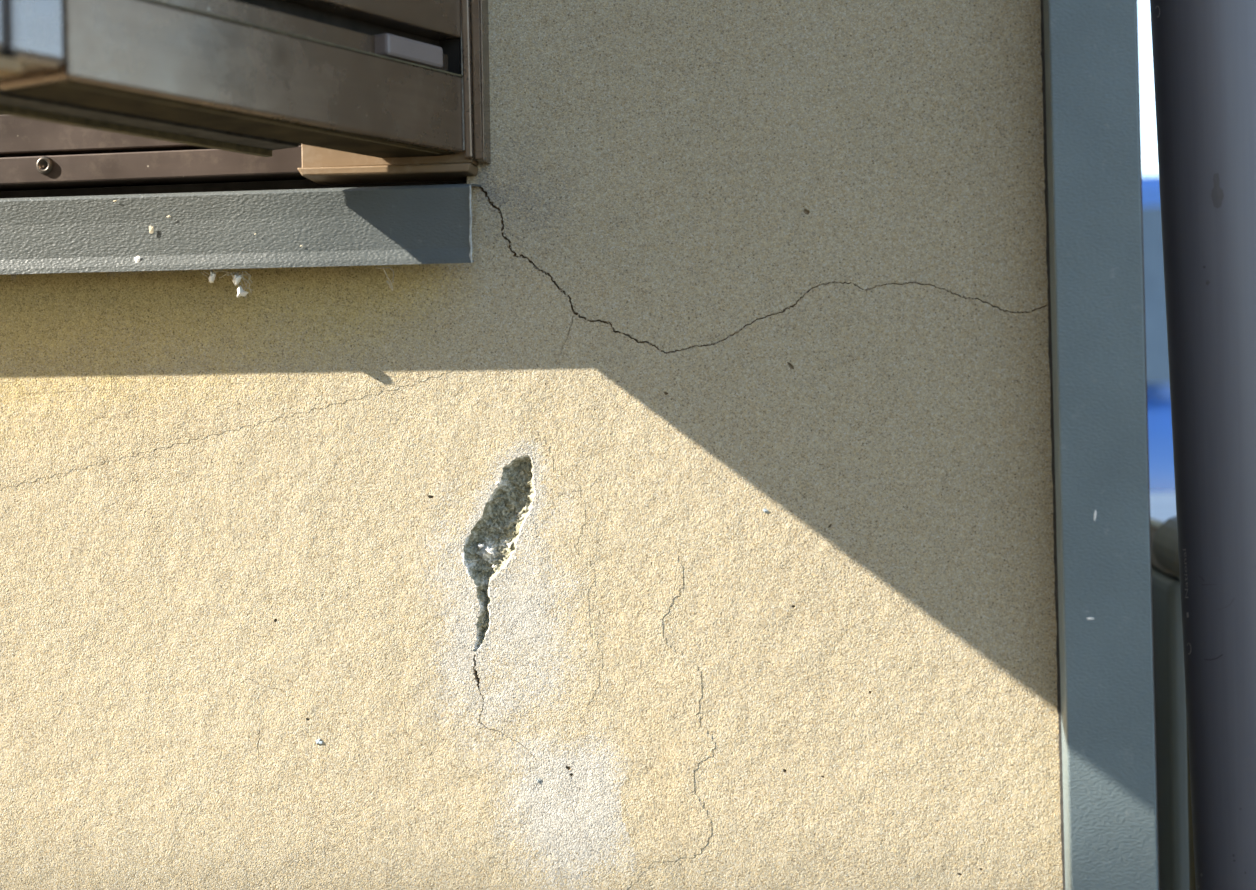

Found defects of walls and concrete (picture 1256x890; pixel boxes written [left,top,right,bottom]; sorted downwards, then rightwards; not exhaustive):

crack [479,187,1047,378]
spalling [460,445,541,655]
crack [473,654,534,757]